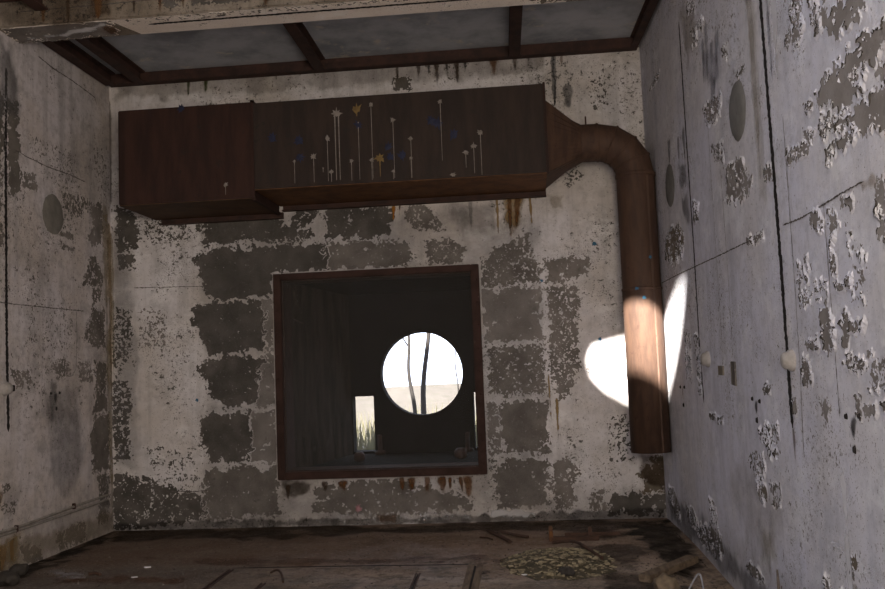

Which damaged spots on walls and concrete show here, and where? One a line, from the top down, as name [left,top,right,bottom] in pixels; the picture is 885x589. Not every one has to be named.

peeling [702,90,723,128]
peeling [784,0,885,170]
rust [496,198,532,234]
peeling [664,220,685,271]
peeling [710,138,753,209]
peeling [873,172,885,246]
peeling [0,89,475,531]
peeling [795,191,885,425]
peeling [479,229,725,563]
rust [399,476,472,496]
peeling [748,419,783,511]
peeling [55,519,87,552]